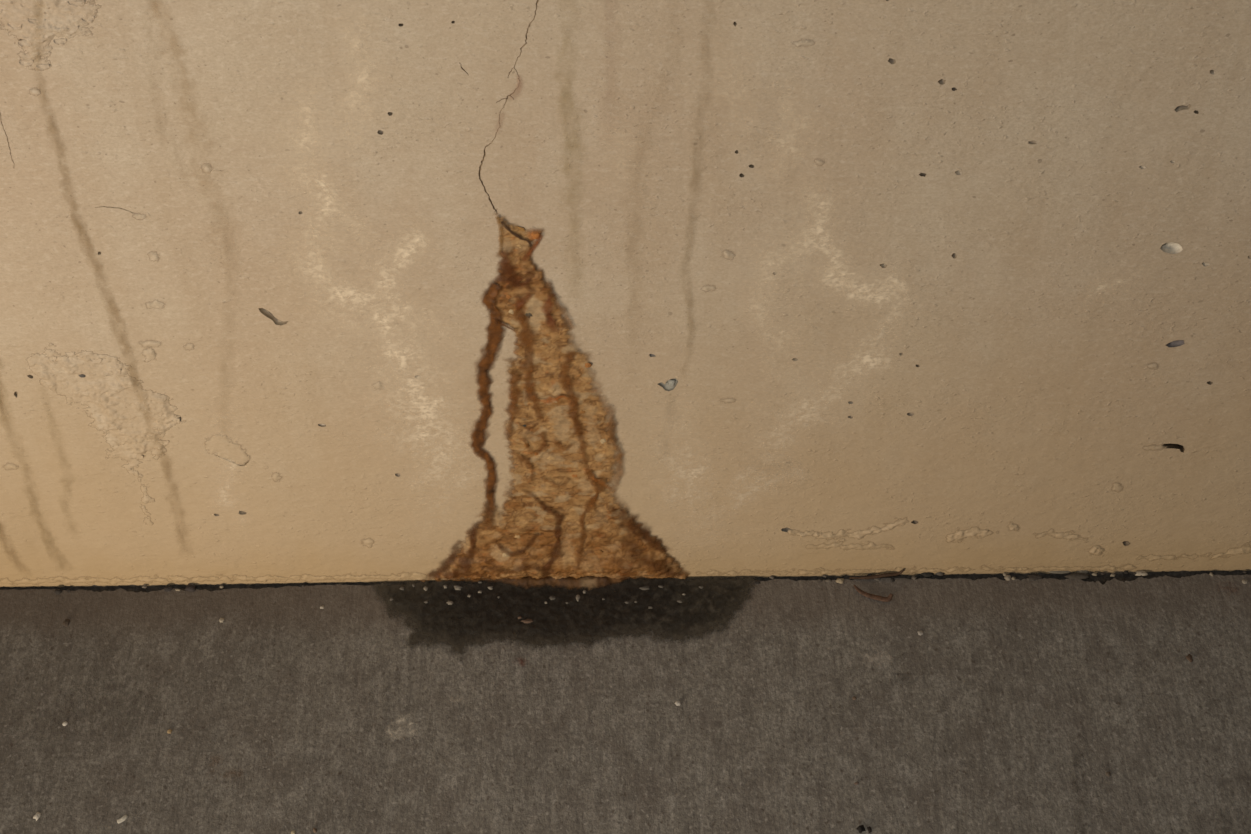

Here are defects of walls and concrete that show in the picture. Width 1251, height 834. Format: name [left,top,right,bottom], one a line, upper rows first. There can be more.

crack [478,0,539,213]
corrosion [422,217,689,589]
water stain [374,576,755,653]